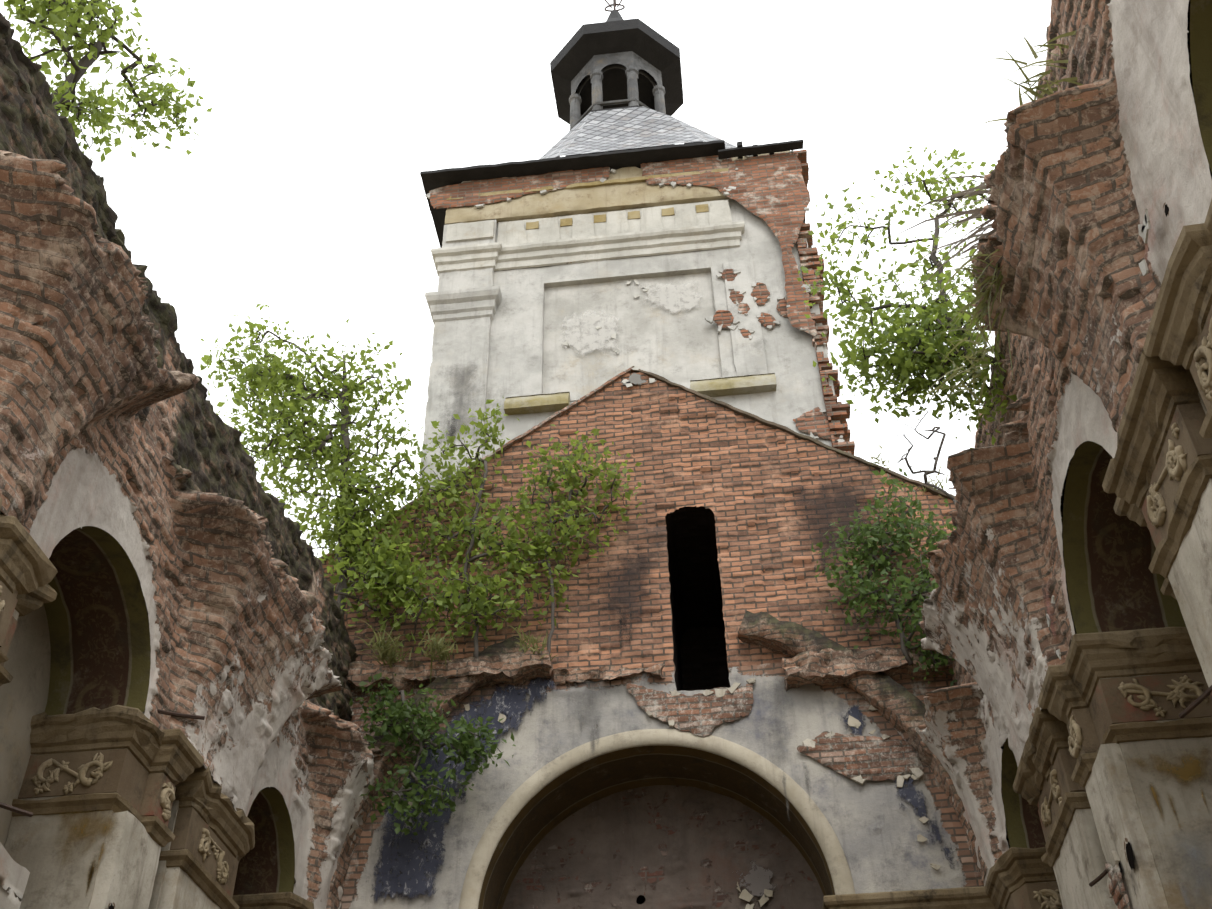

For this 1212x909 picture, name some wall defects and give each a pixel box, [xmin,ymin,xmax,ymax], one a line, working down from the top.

flaking render [425,167,616,209]
peeling [626,279,700,313]
flaking render [641,149,855,455]
peeling [621,366,656,388]
flaking render [626,678,756,737]
flaking render [797,705,955,870]
peeling [732,860,779,909]
flaking render [1105,838,1135,909]